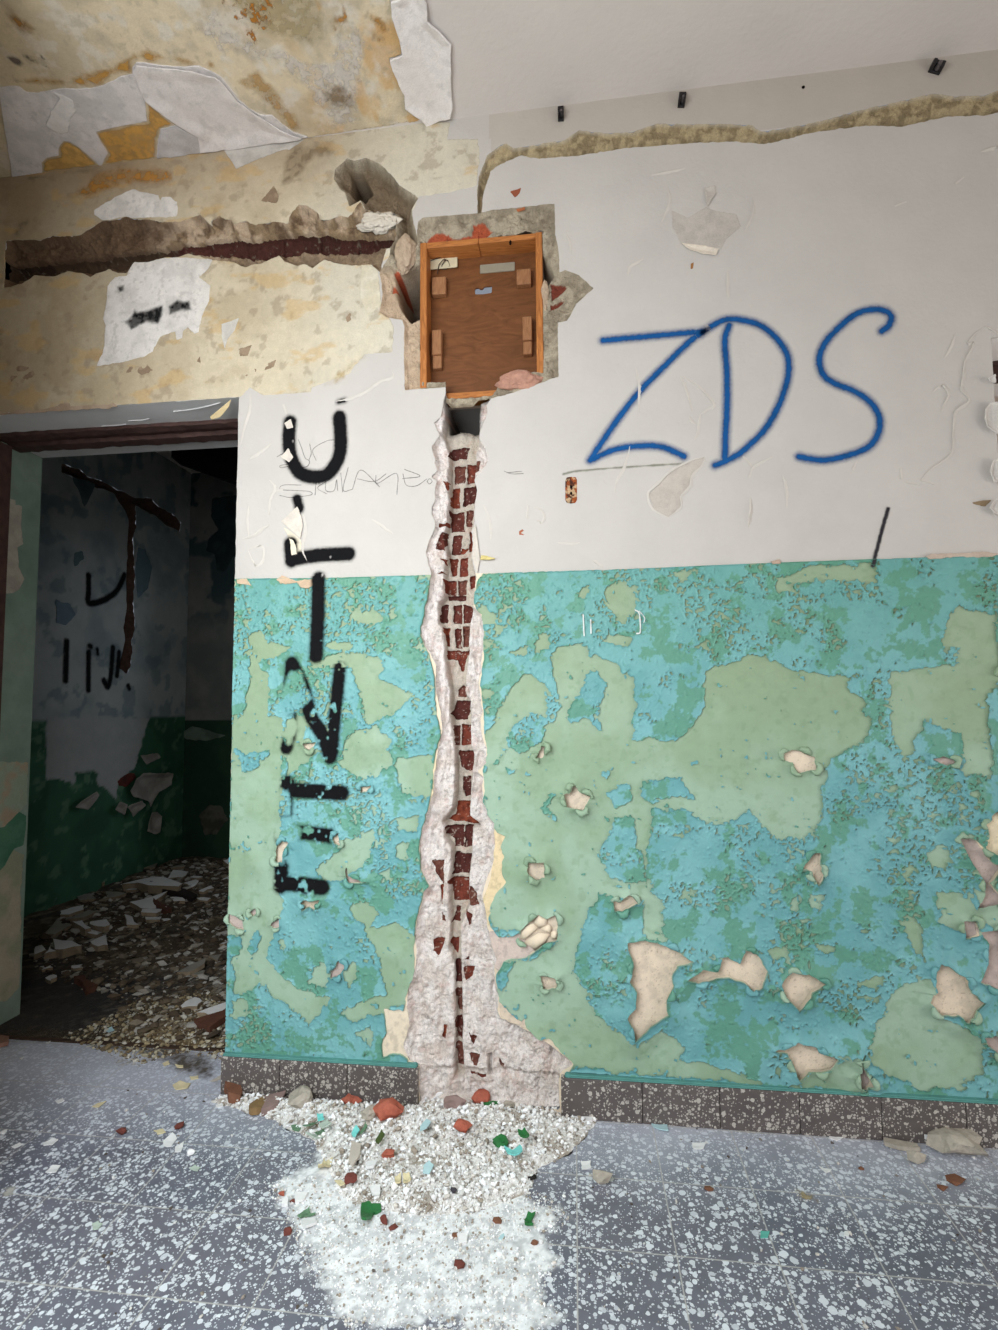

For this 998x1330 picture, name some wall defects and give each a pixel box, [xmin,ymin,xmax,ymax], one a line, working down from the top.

flaking render [0,0,593,415]
peeling [671,186,741,255]
peeling [76,792,99,810]
peeling [115,753,174,834]
peeling [184,495,440,1063]
crack [403,394,572,1107]
peeling [474,551,998,1099]